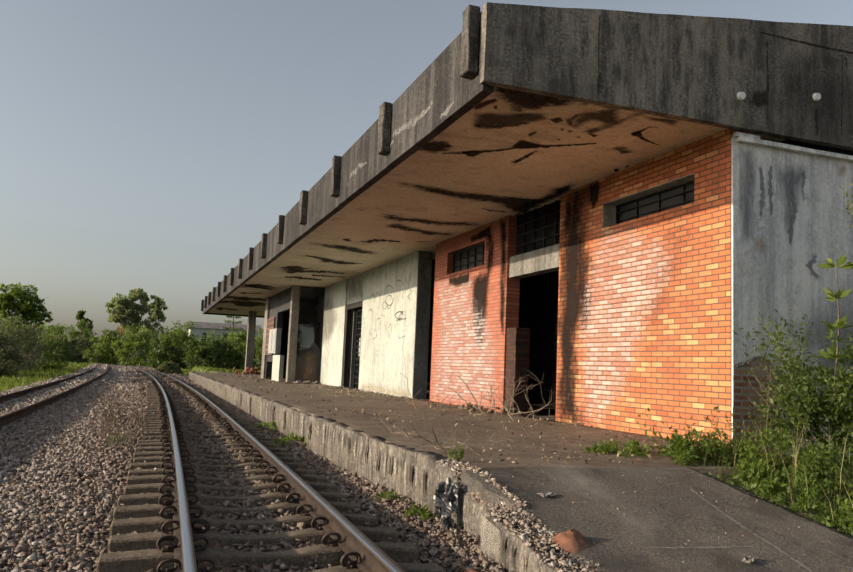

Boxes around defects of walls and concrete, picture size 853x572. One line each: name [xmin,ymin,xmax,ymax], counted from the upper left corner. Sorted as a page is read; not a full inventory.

crack [760,32,853,134]
leakage [475,87,571,128]
leakage [566,103,624,133]
leakage [419,141,451,152]
crack [631,127,661,146]
leakage [590,183,599,207]
leakage [743,155,805,243]
leakage [384,215,474,242]
leakage [278,255,362,281]
leakage [321,239,400,254]
leakage [415,185,534,330]